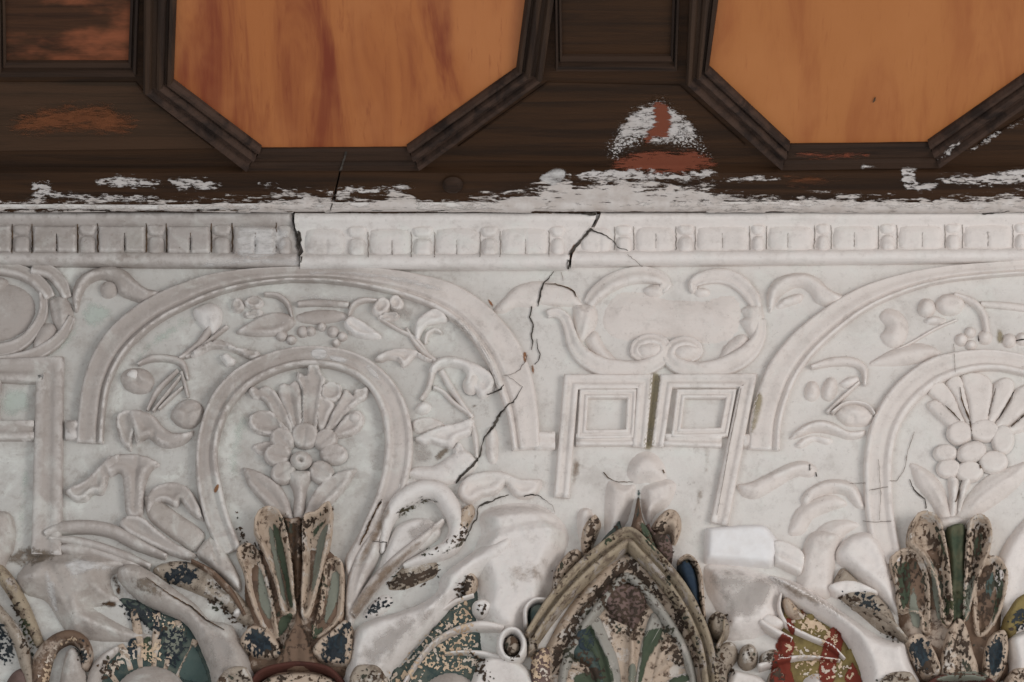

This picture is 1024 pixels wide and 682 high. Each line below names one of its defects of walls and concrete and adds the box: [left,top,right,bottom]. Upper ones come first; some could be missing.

peeling [18,105,136,133]
crack [285,211,302,263]
crack [330,151,416,213]
crack [456,212,643,484]
peeling [0,593,35,665]
peeling [38,560,189,682]
peeling [163,507,354,682]
peeling [365,504,475,618]
peeling [357,575,495,682]
peeling [504,512,735,682]
peeling [743,605,854,682]
peeling [838,523,1024,682]